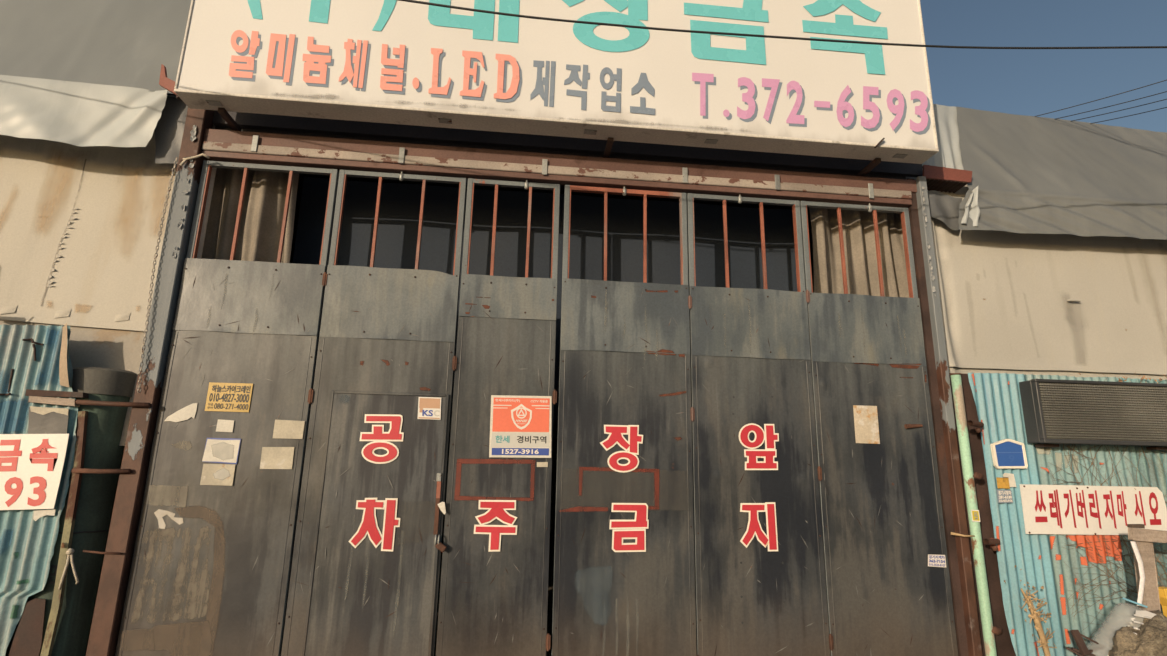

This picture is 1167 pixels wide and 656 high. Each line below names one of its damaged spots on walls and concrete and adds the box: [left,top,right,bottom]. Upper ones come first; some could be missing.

peeling [1038,535,1122,566]
peeling [1060,574,1078,615]